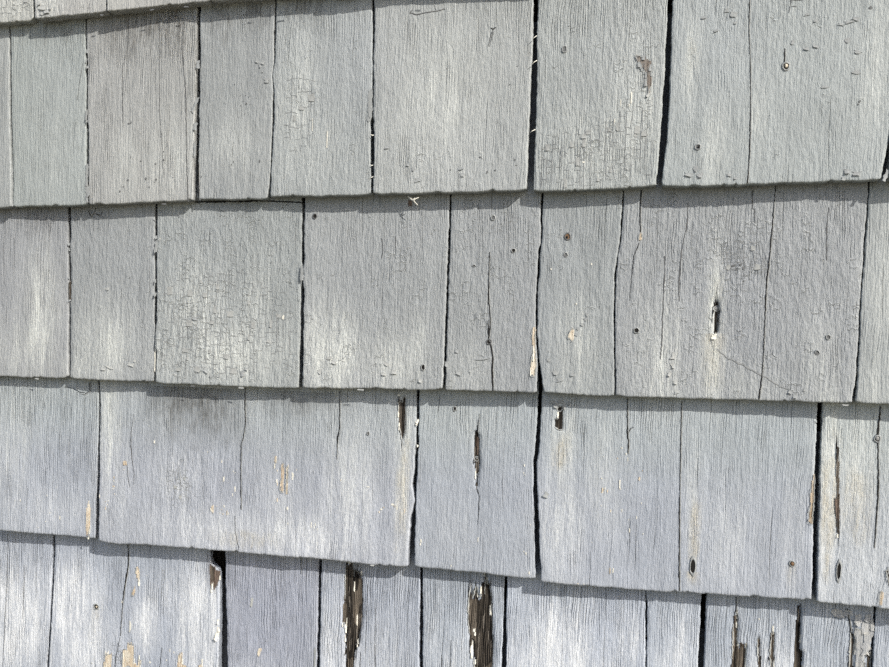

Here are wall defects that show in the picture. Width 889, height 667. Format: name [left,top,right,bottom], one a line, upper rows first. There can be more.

crack [161,272,293,510]
peeling [103,623,151,667]
peeling [731,612,775,667]